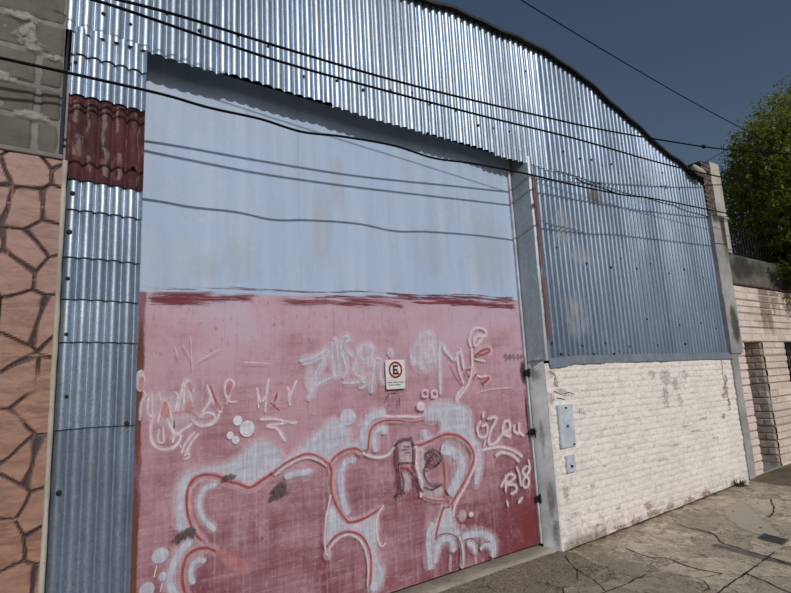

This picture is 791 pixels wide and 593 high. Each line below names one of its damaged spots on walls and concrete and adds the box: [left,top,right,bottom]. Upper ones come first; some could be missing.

water stain [713,214,728,251]
corrosion [533,176,550,342]
water stain [731,309,740,339]
crack [678,524,790,564]
crack [562,548,738,593]